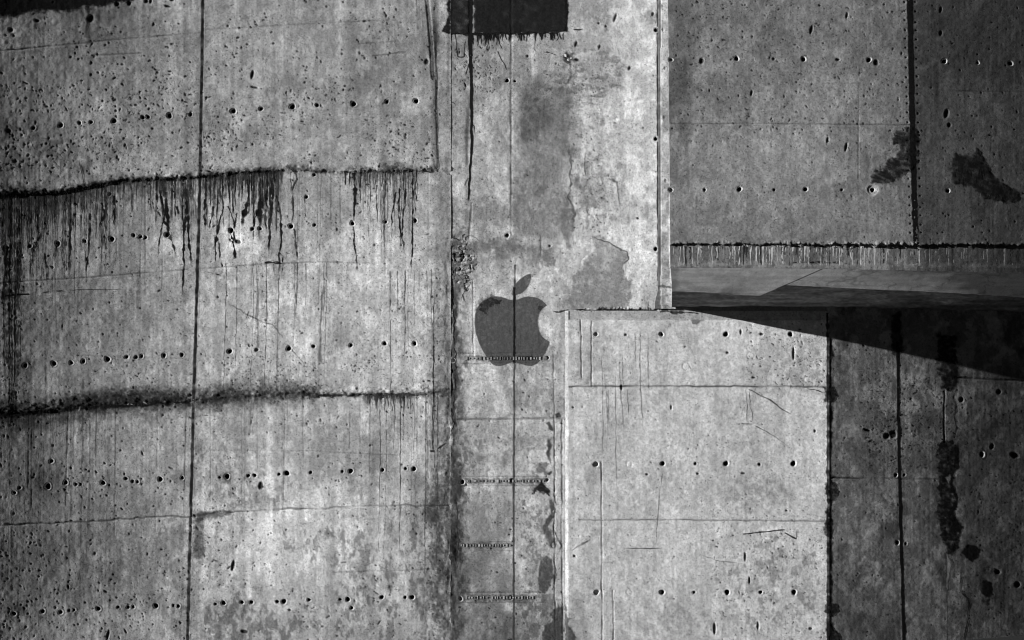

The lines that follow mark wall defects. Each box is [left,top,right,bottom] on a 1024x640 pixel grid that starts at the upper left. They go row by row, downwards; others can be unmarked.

water stain [454,33,564,68]
water stain [0,165,438,597]